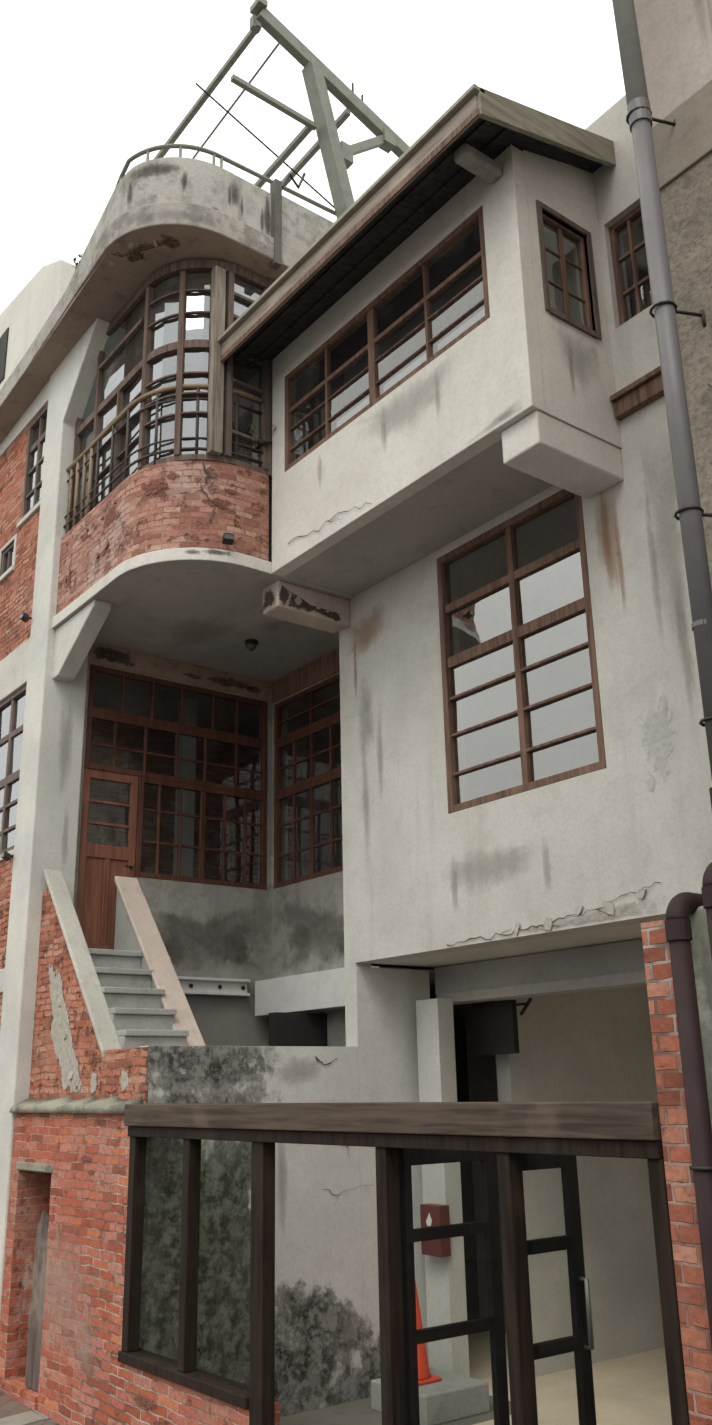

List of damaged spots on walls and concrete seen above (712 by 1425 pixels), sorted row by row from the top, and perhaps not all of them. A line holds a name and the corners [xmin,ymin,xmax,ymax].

water stain [127,164,187,202]
water stain [214,187,243,212]
water stain [261,200,270,232]
peeling [110,235,180,265]
crack [186,462,232,523]
crack [288,503,371,544]
water stain [163,914,251,960]
water stain [292,911,344,958]
crack [447,882,661,946]